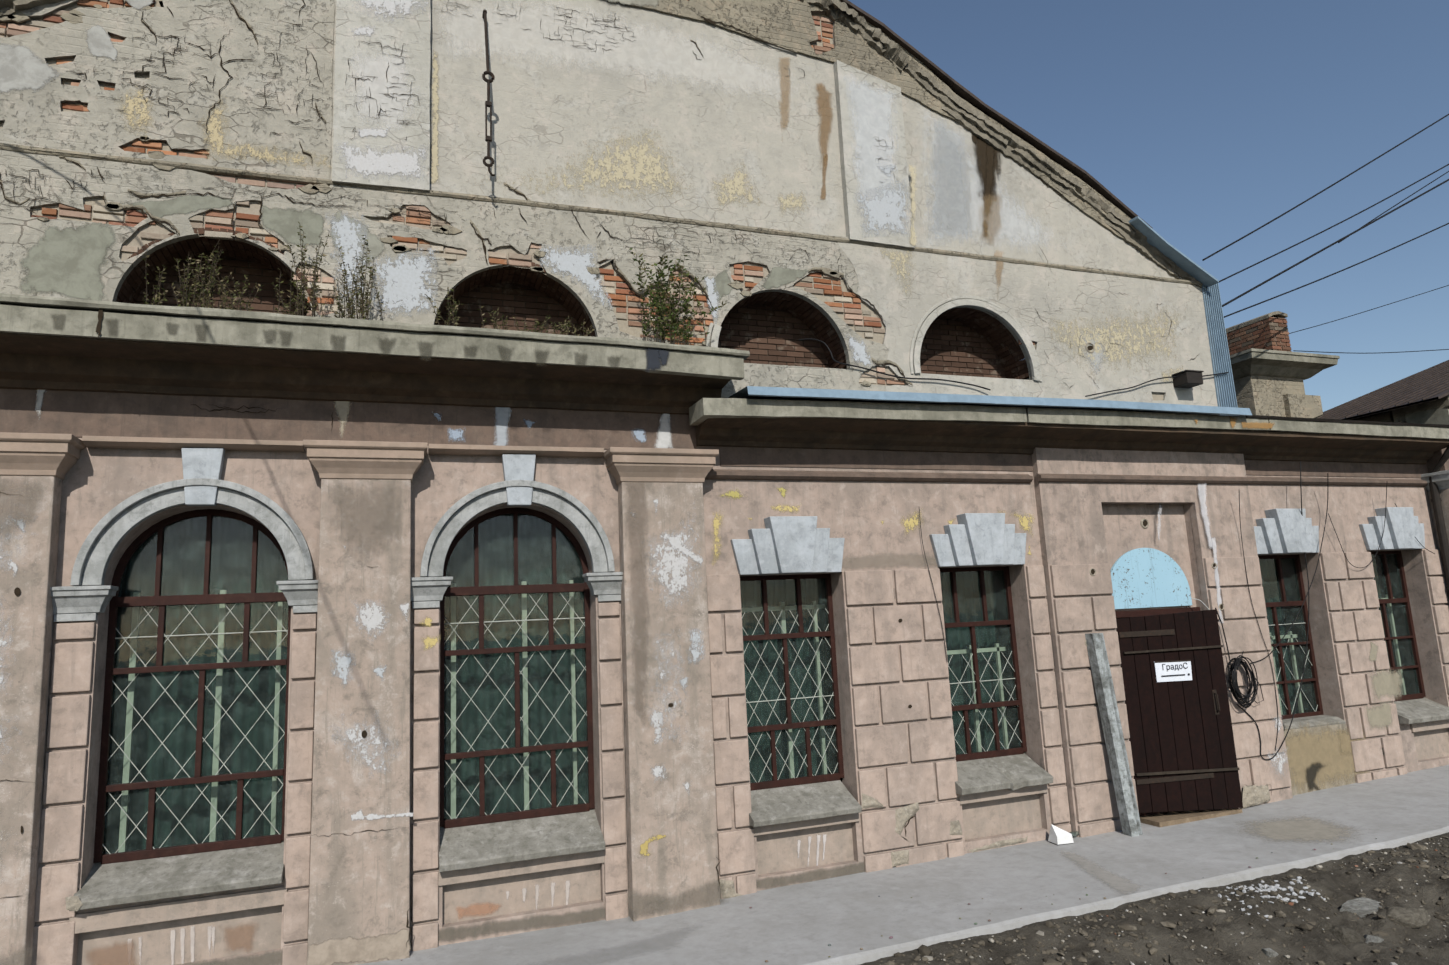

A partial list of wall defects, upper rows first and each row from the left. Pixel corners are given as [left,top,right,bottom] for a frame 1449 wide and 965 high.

spalling [0,0,162,38]
peeling [354,0,428,36]
spalling [798,0,834,55]
spalling [47,58,75,66]
spalling [62,103,89,112]
peeling [99,52,467,316]
peeling [518,130,680,195]
water stain [972,133,1001,236]
spalling [31,198,173,261]
spalling [488,243,769,346]
spalling [792,268,906,386]
peeling [649,515,721,606]